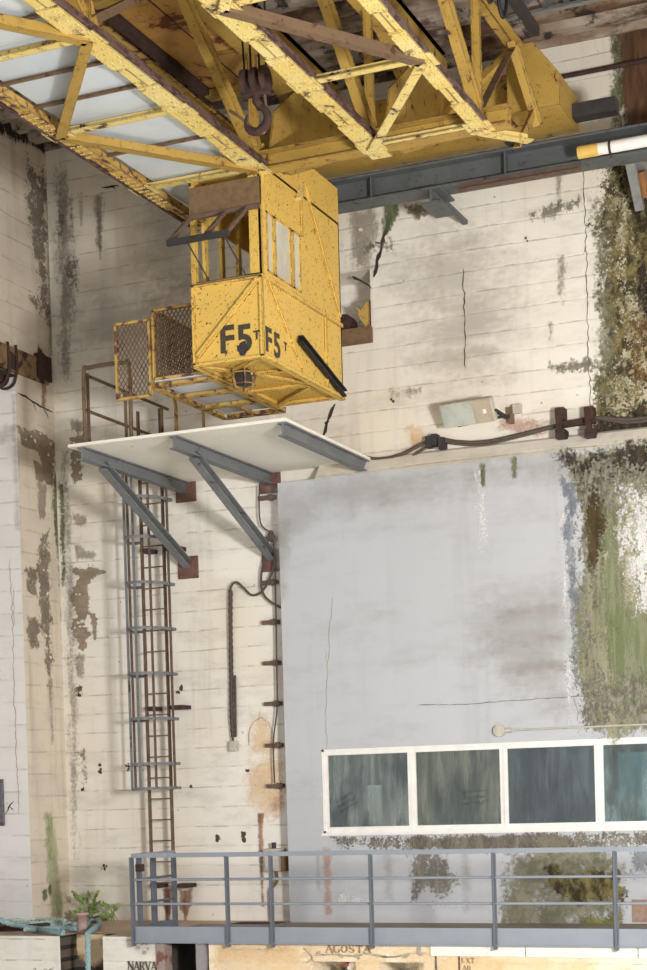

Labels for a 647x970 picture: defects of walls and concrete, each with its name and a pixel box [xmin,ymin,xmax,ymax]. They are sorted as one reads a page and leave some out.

damp [0,122,45,153]
damp [619,166,647,320]
crack [460,270,468,366]
peeling [16,425,55,486]
peeling [24,529,55,676]
peeling [70,565,107,651]
damp [558,471,609,724]
crack [324,608,332,748]
rust [251,761,280,906]
damp [410,854,459,900]
damp [632,851,647,871]